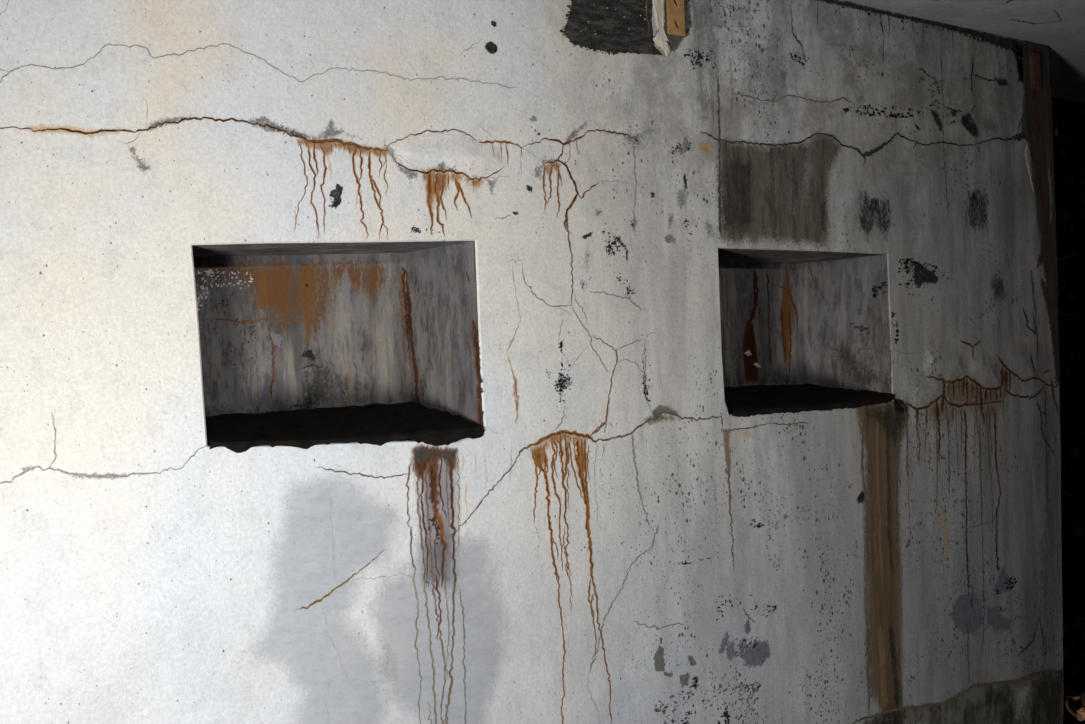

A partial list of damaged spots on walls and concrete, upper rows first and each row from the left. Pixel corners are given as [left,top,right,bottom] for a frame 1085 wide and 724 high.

crack [0,41,516,88]
rust [294,139,388,240]
rust [424,169,482,237]
water stain [664,174,692,250]
water stain [671,1,839,246]
crack [732,91,871,109]
crack [0,99,1029,704]
crack [898,307,1060,455]
rust [406,445,466,724]
rust [529,405,612,724]
rust [857,367,1020,716]
water stain [865,617,1064,724]